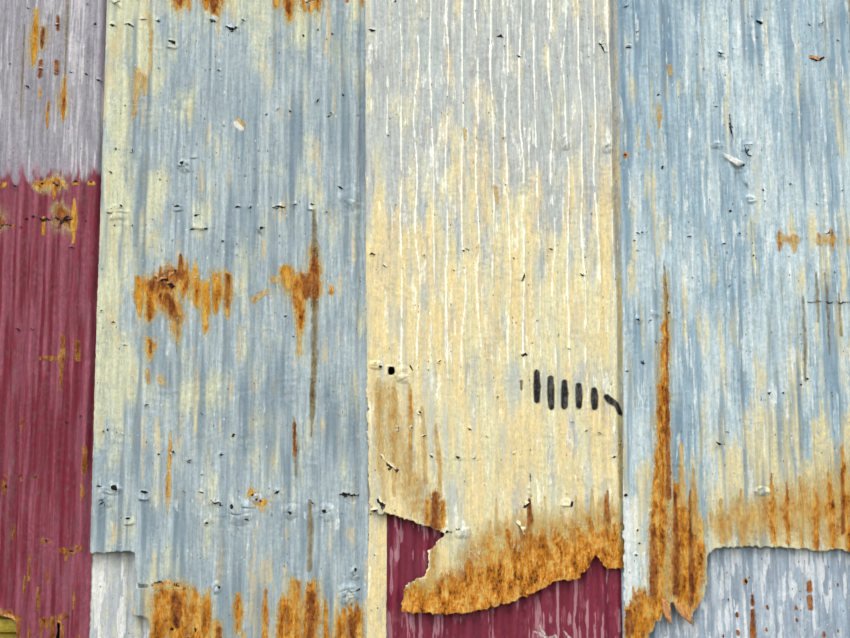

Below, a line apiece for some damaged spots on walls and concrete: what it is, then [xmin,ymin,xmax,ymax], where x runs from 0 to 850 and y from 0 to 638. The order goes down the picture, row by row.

corrosion [172,0,191,12]
corrosion [203,0,224,16]
corrosion [273,0,322,24]
corrosion [33,177,95,244]
corrosion [134,252,233,352]
corrosion [270,204,334,437]
corrosion [624,266,850,638]
corrosion [401,417,625,615]
corrosion [261,500,363,638]
corrosion [149,580,222,638]
corrosion [233,592,246,638]
peeling [533,625,571,638]